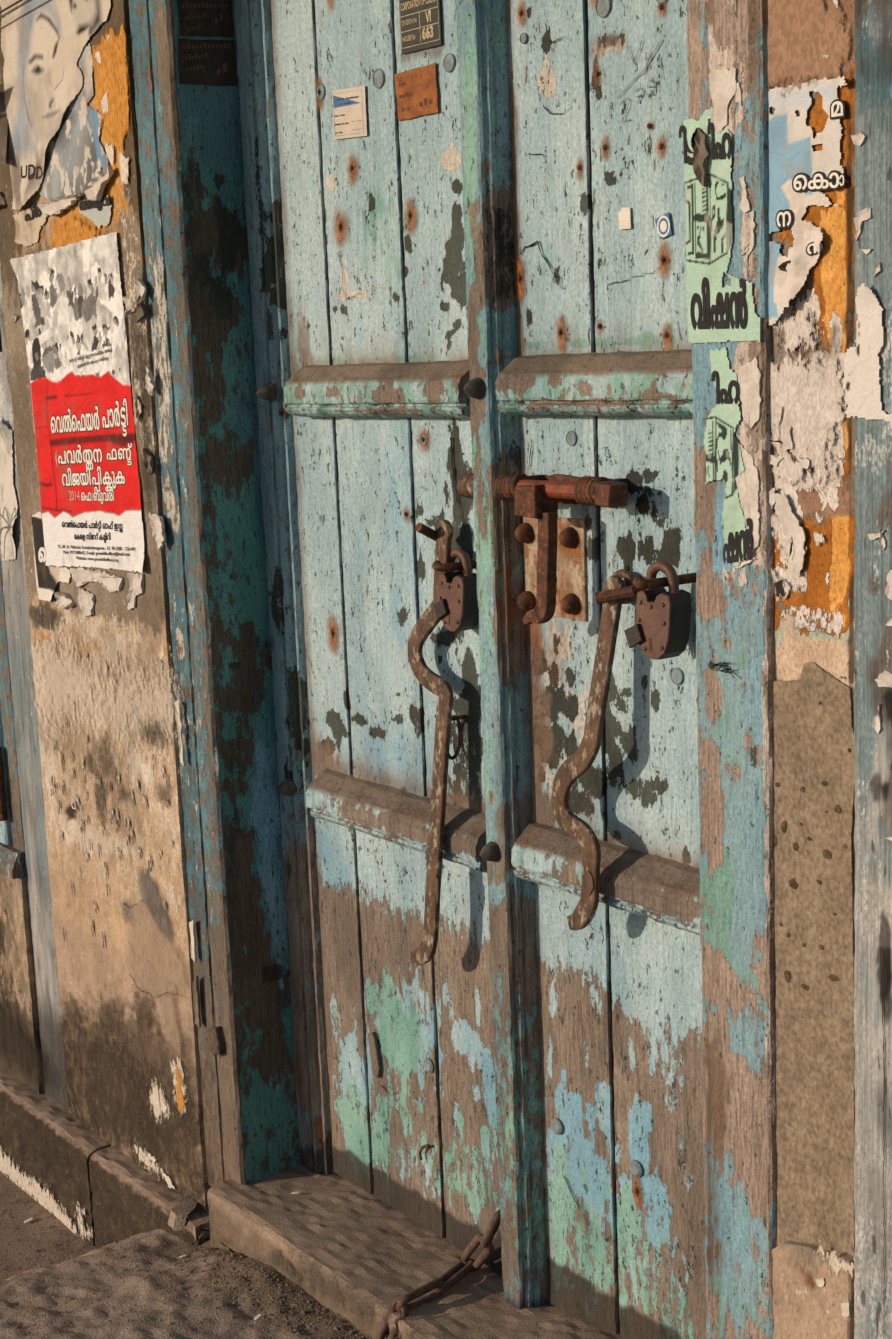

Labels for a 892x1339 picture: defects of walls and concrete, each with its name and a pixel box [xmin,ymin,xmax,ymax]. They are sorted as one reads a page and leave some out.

peeling [767,0,850,96]
peeling [769,307,848,492]
peeling [770,512,825,562]
peeling [771,569,800,599]
leakage [883,688,892,719]
leakage [121,872,169,938]
leakage [881,948,889,1000]
leakage [0,991,207,1193]